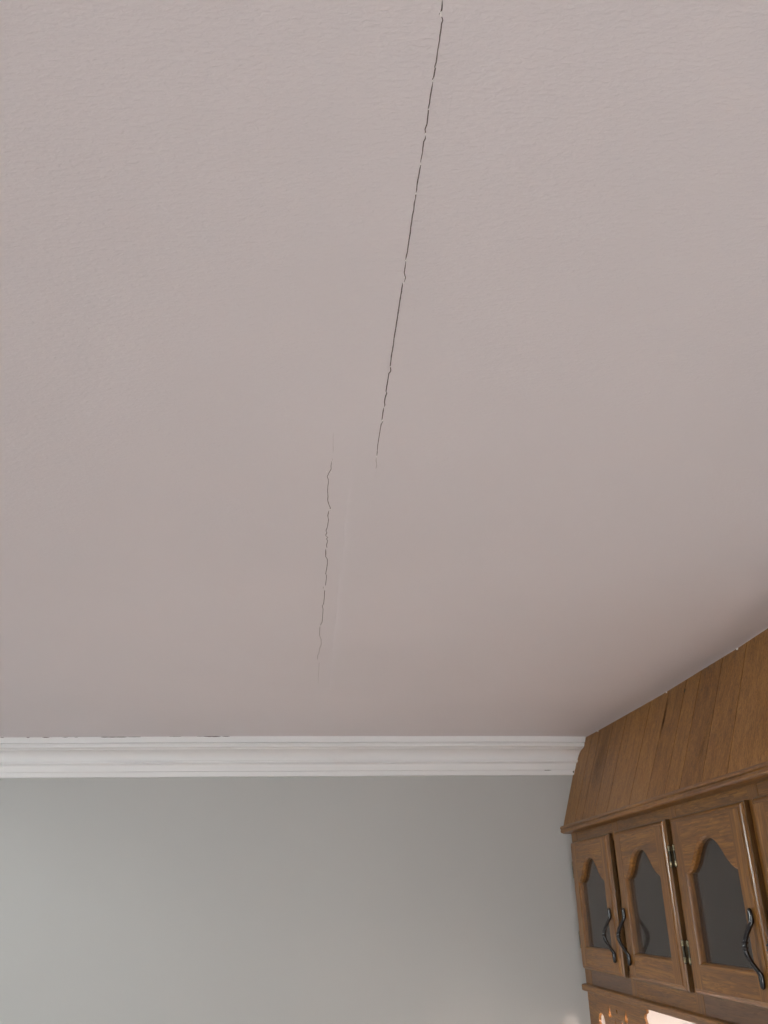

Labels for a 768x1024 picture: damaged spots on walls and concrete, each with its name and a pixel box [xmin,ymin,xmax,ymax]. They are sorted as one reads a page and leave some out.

crack [373,0,466,484]
crack [317,459,340,676]